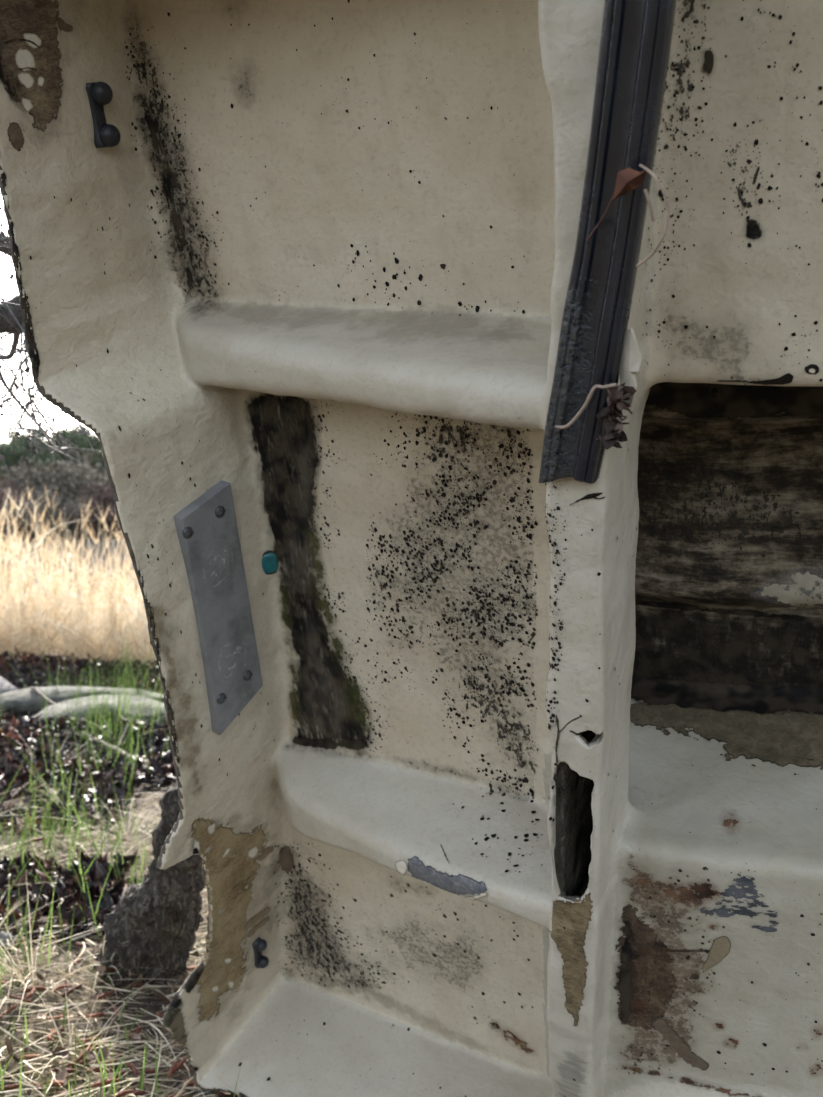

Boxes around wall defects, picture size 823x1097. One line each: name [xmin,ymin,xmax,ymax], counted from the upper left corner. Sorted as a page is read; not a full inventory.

peeling [0,0,73,151]
damp [125,14,224,311]
damp [645,0,731,289]
damp [721,120,787,248]
damp [645,364,823,420]
damp [249,395,567,872]
peeling [761,572,823,611]
peeling [191,818,274,1023]
damp [274,842,394,989]
peeling [395,844,487,901]
spalling [549,893,593,1026]
corrosion [616,855,761,1097]